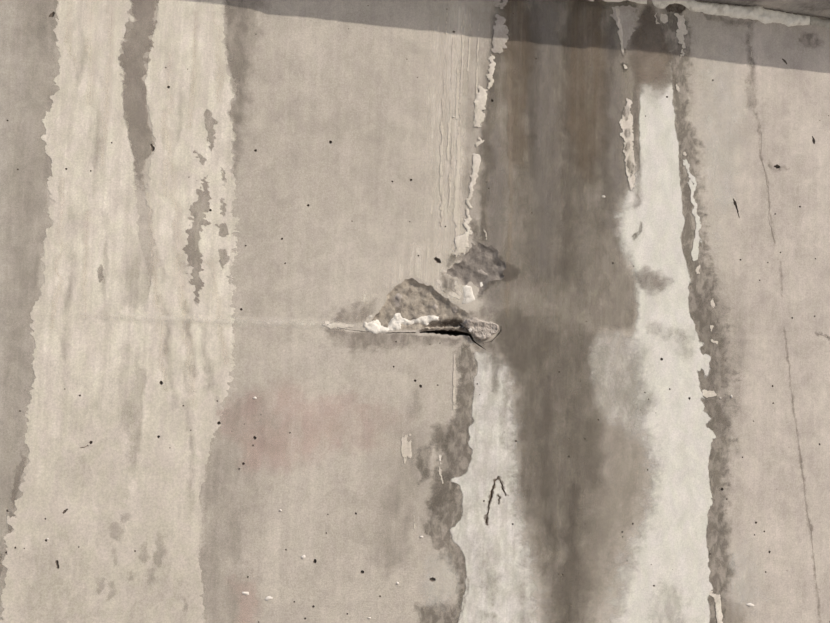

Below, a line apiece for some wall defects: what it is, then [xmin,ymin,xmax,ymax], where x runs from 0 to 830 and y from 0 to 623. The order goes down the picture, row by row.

peeling [474,0,509,127]
damp [0,0,244,623]
crack [346,328,501,350]
spalling [363,137,506,340]
damp [414,0,734,623]
crack [484,476,509,525]